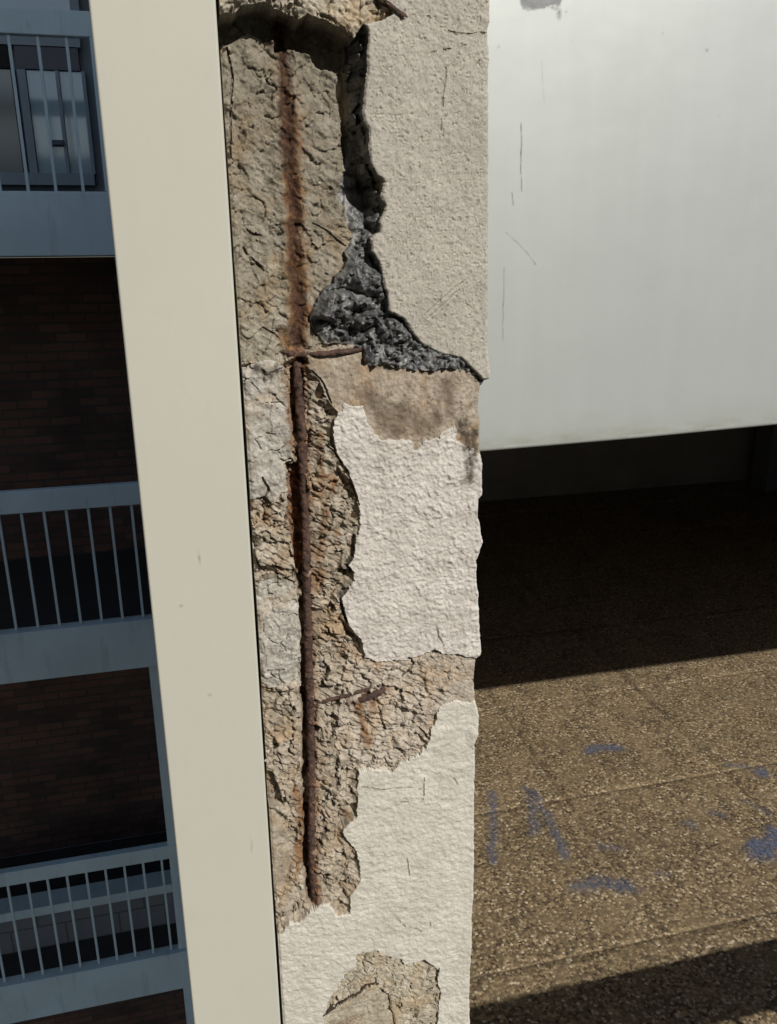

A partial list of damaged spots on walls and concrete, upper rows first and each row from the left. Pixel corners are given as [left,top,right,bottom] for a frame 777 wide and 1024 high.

crack [226,46,234,160]
corrosion [272,17,311,367]
crack [242,228,265,272]
crack [312,222,346,247]
crack [261,326,280,340]
spalling [218,0,481,935]
corrosion [292,786,304,869]
spalling [324,950,441,1024]